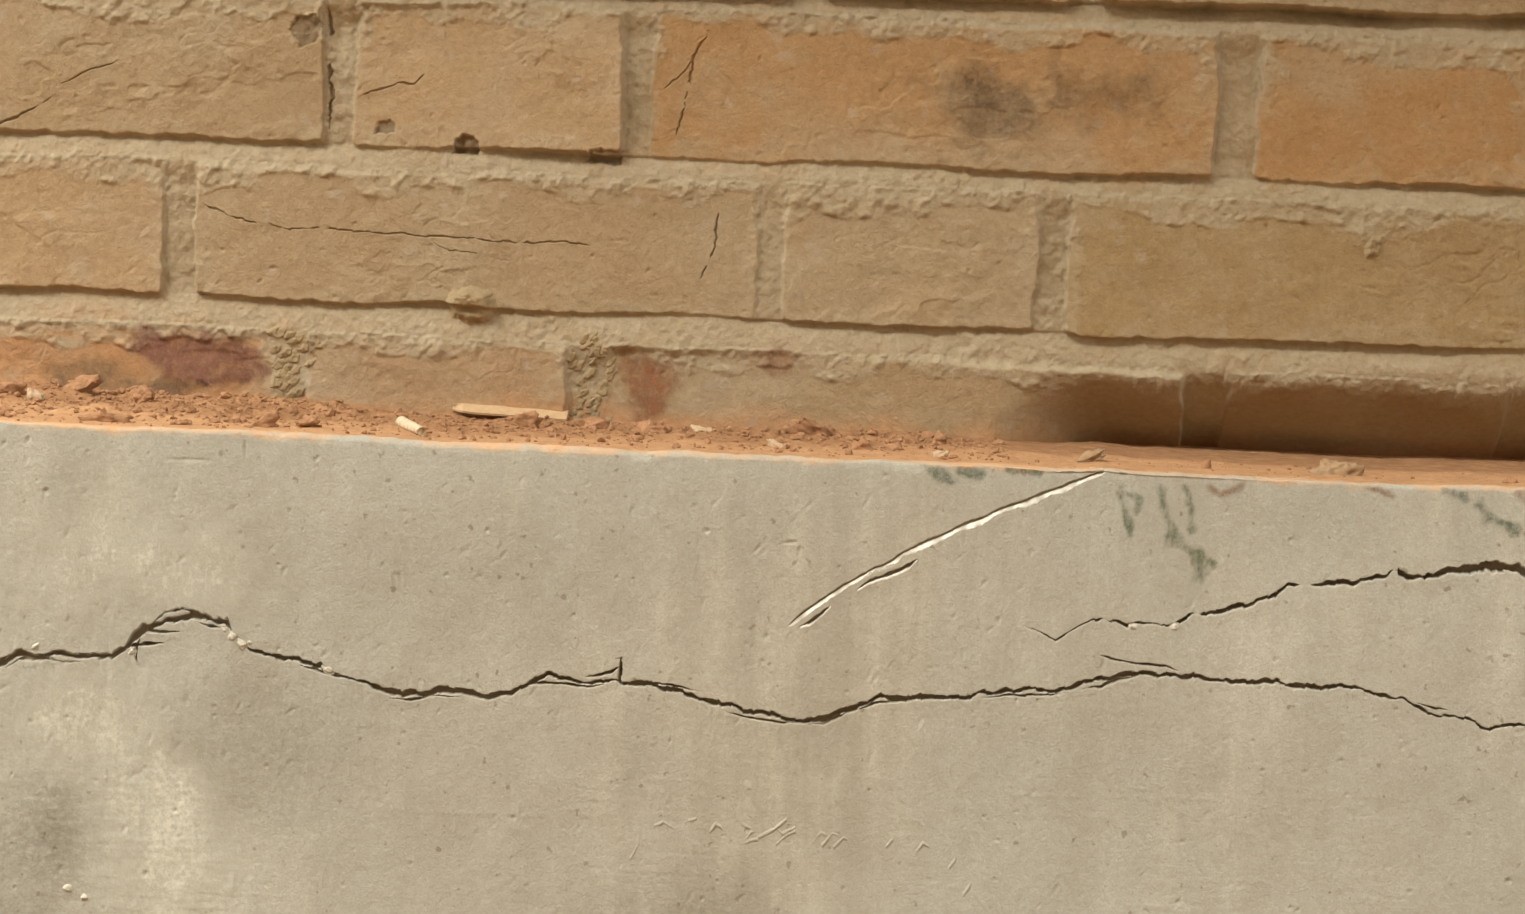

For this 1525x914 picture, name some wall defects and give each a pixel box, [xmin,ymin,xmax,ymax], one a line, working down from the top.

crack [788,471,1108,633]
crack [0,553,1525,738]